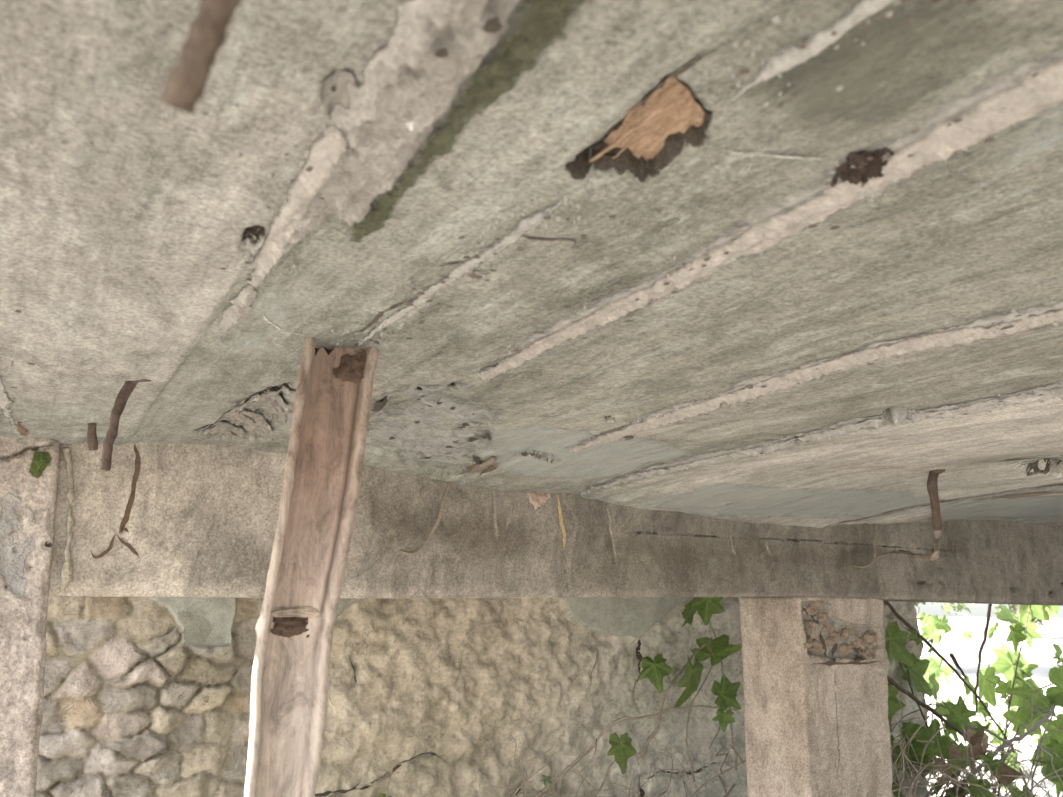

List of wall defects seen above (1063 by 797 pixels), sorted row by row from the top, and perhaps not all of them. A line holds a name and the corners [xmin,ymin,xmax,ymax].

leakage [802,20,923,109]
spalling [320,69,355,118]
spalling [565,44,721,182]
rust [831,147,894,187]
spalling [242,225,265,244]
spalling [999,458,1062,476]
spalling [802,601,885,666]